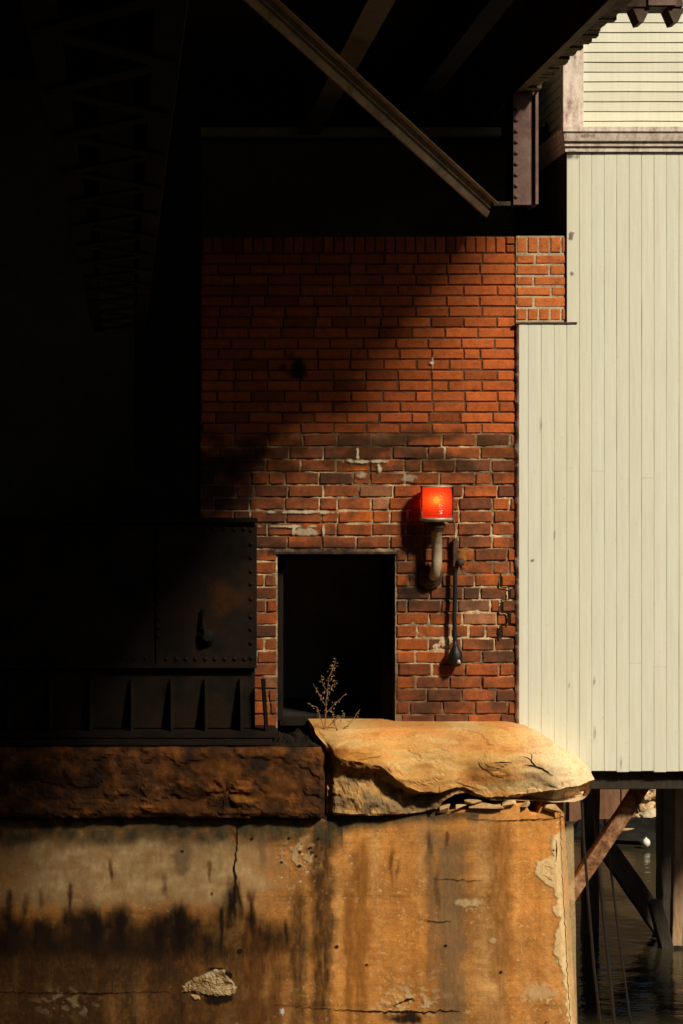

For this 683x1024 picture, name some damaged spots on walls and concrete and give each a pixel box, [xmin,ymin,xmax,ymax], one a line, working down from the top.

spalling [182,967,237,1004]
crack [220,827,242,950]
water stain [0,812,479,1024]
rust [345,846,369,1024]
crack [281,968,461,1024]
peeling [535,832,576,1024]